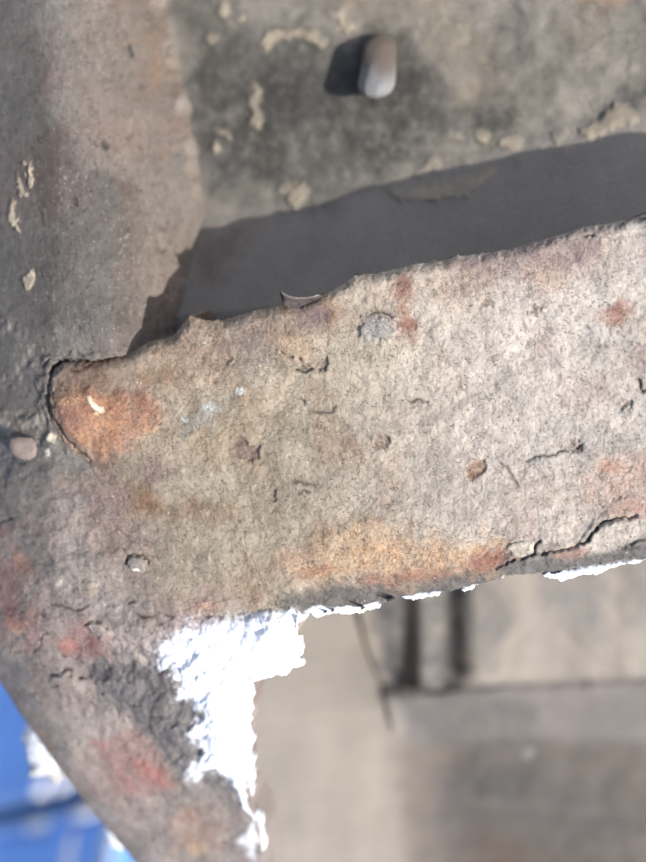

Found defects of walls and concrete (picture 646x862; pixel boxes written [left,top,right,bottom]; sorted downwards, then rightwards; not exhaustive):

peeling [257,4,355,54]
peeling [247,79,265,132]
leakage [165,0,531,224]
peeling [7,159,34,234]
peeling [22,268,35,291]
corrosion [384,268,424,349]
crack [44,358,90,460]
corrosion [0,517,116,666]
corrosion [271,512,525,599]
crack [497,516,633,568]
leakage [0,636,202,783]
corrosion [86,727,181,800]